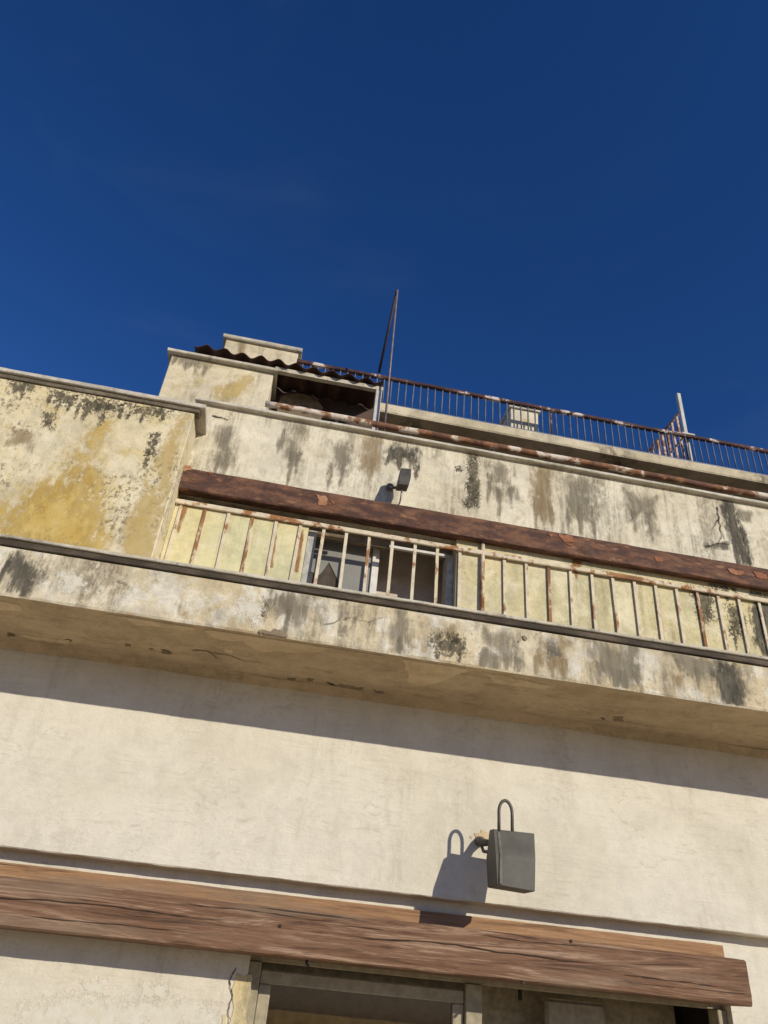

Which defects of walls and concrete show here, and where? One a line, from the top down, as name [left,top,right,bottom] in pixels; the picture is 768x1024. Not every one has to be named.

leakage [0,380,188,557]
leakage [361,439,422,478]
leakage [455,453,515,516]
leakage [530,466,554,529]
crack [705,506,753,564]
leakage [707,500,753,566]
leakage [0,551,48,596]
mould [426,629,466,662]
leakage [480,628,572,679]
leakage [667,652,746,706]
mould [689,583,768,655]
crack [228,968,236,1024]